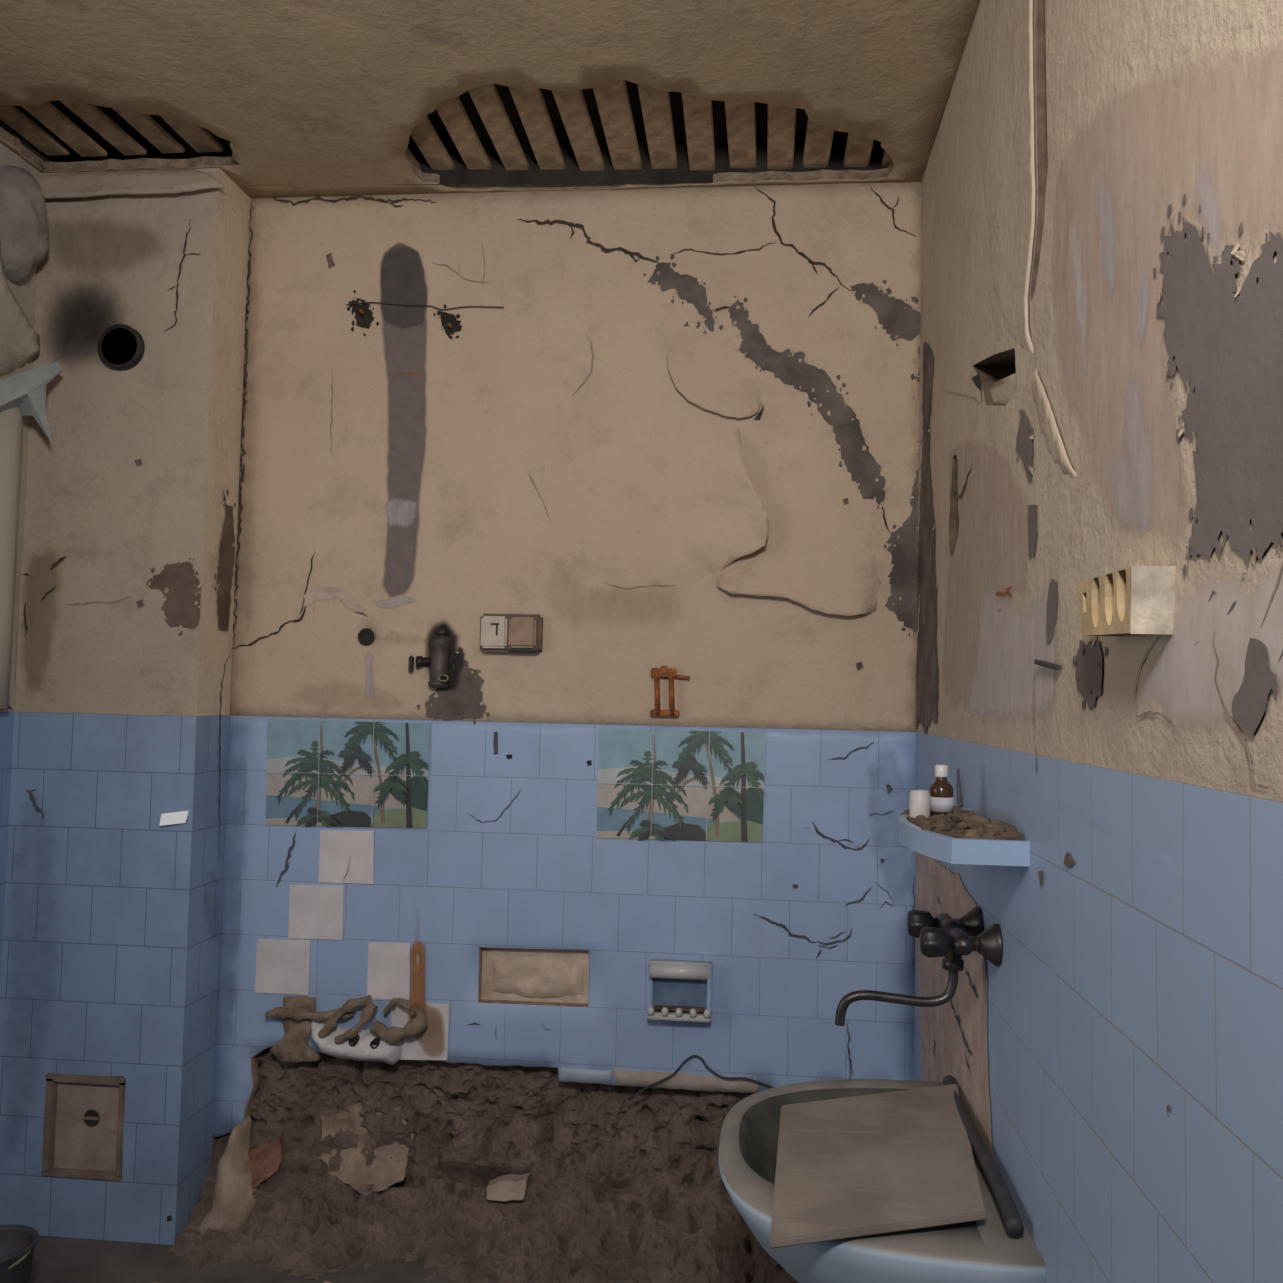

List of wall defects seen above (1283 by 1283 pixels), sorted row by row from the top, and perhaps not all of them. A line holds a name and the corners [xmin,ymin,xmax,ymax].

crack [518,187,853,318]
crack [871,188,916,237]
peeling [136,489,236,636]
leakage [376,244,427,608]
crack [571,336,594,397]
crack [603,582,673,590]
crack [754,404,764,420]
peeling [850,280,1057,734]
peeling [1138,178,1283,736]
peeling [916,852,976,919]
peeling [916,938,995,1162]
spalling [167,1046,799,1283]